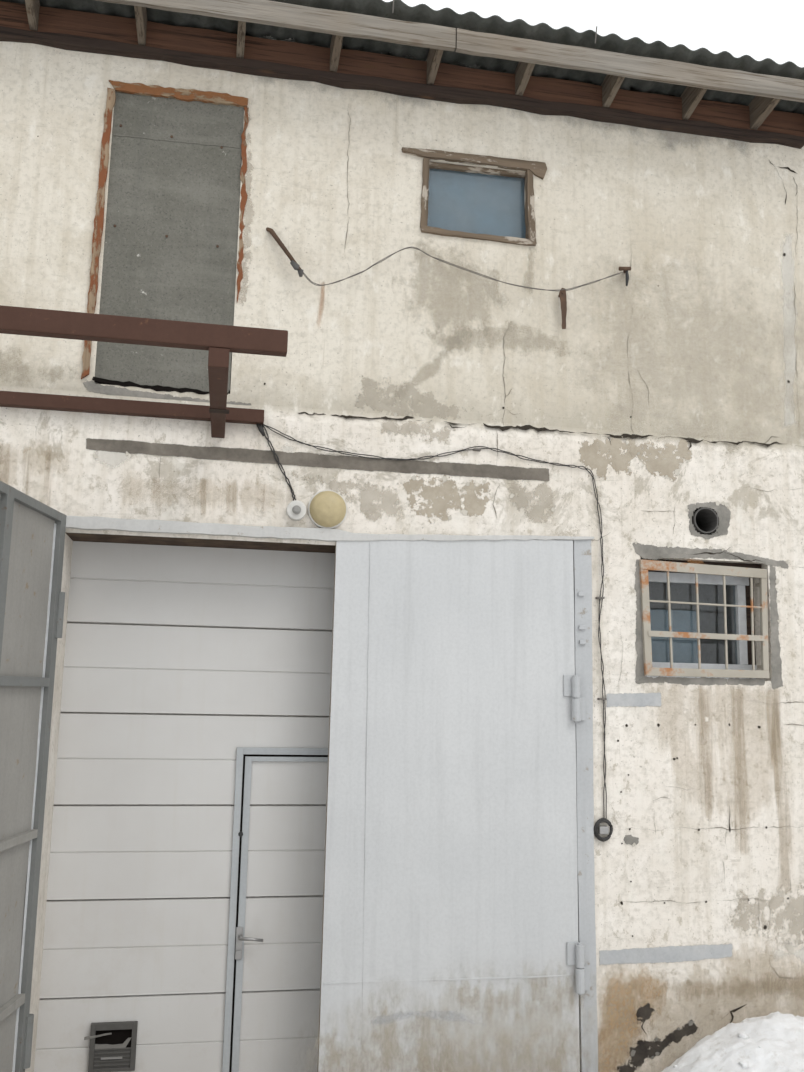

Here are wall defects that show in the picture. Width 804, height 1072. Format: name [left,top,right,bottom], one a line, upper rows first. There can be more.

crack [292,157,801,518]
peeling [578,437,692,482]
peeling [395,474,490,523]
leakage [598,977,662,1072]
spalling [617,1003,698,1072]